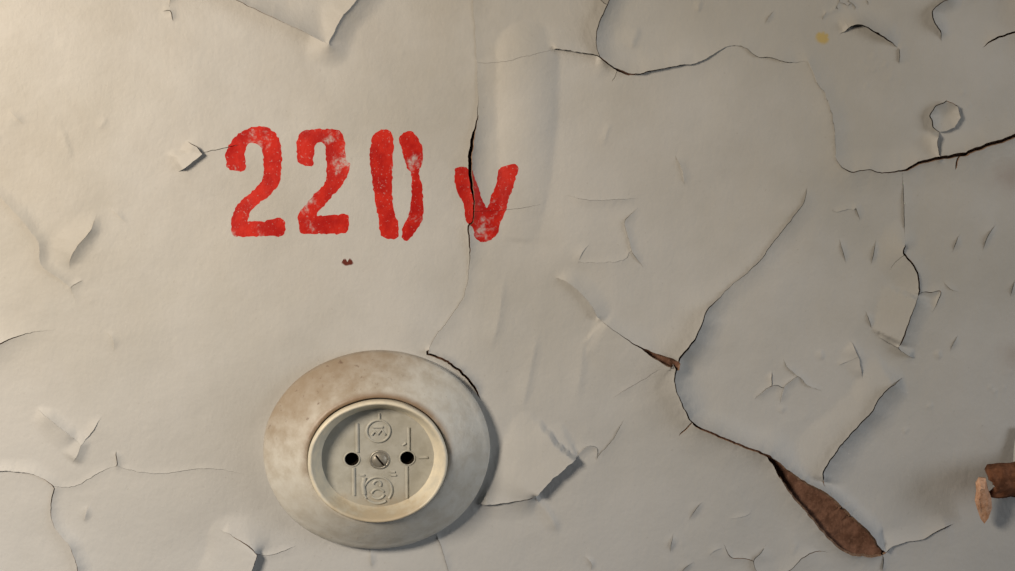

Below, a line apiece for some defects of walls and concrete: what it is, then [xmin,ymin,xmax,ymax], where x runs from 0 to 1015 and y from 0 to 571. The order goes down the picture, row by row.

crack [0,320,67,359]
crack [424,0,1015,571]
crack [0,448,247,571]
peeling [975,441,1015,524]